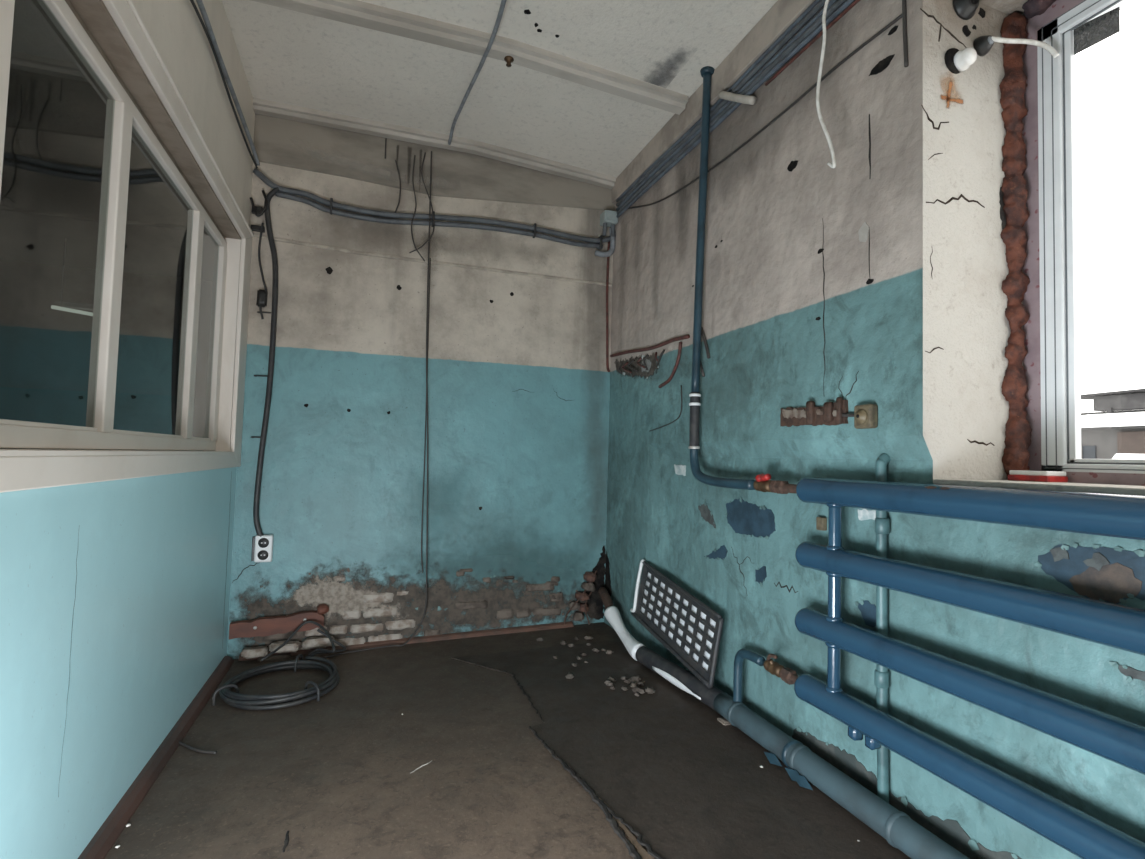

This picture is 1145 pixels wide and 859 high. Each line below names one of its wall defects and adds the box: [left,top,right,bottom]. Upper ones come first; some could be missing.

peeling [698,498,776,540]
spalling [235,546,612,659]
peeling [704,545,728,560]
peeling [1034,543,1145,604]
peeling [764,752,813,790]
spalling [789,727,1021,859]